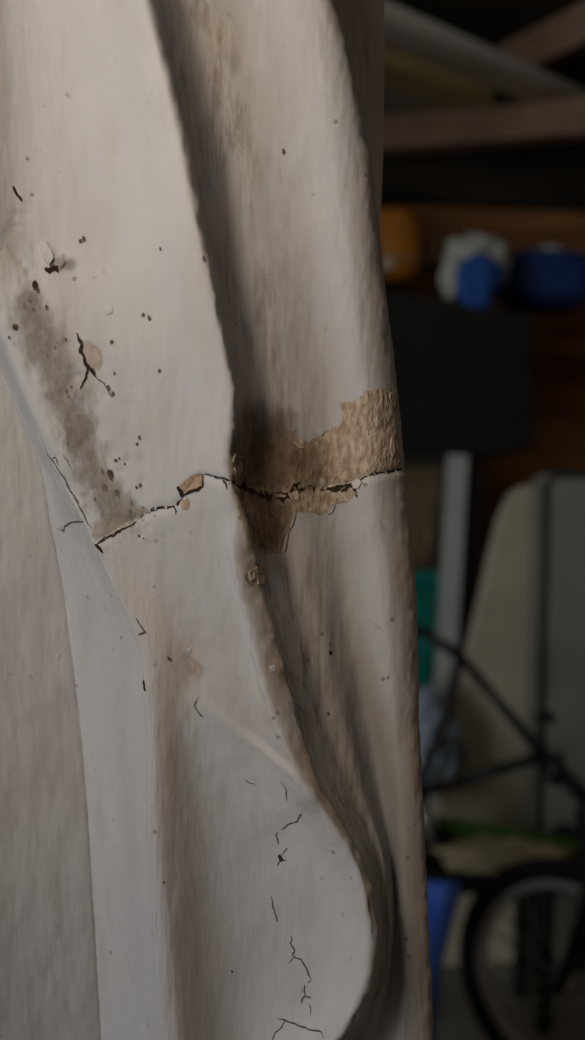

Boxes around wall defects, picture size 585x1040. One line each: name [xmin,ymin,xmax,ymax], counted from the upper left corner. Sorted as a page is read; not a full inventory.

crack [45,449,402,553]
peeling [228,388,400,587]
crack [275,783,302,865]
crack [271,897,323,1040]